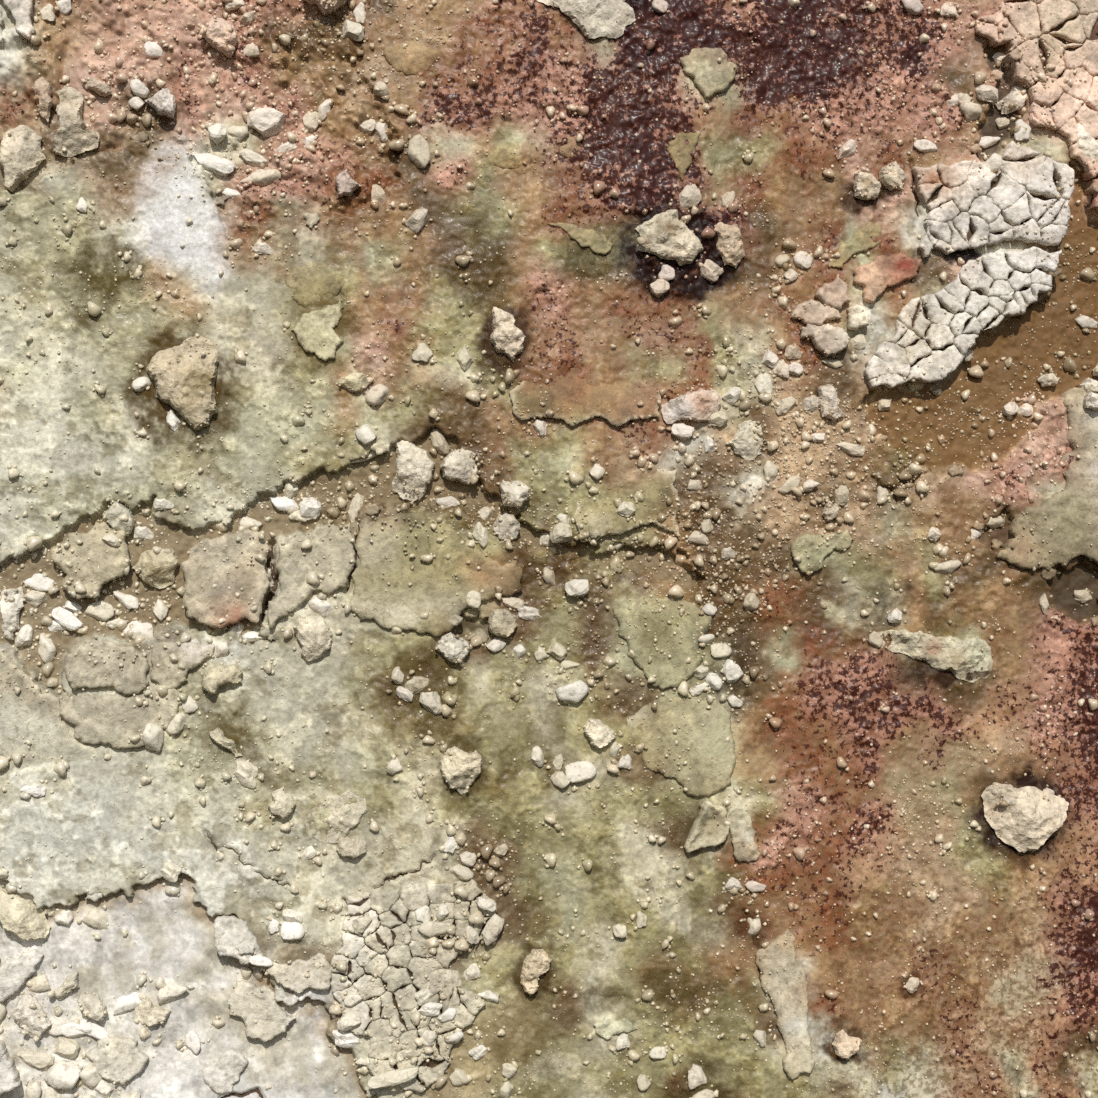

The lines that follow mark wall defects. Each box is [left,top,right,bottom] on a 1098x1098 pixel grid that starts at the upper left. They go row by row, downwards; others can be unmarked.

rust [518,260,600,382]
rust [602,281,711,458]
rust [405,0,996,256]
rust [774,213,849,386]
crack [863,0,1098,389]
crack [261,545,279,621]
crack [347,522,360,591]
spalling [0,429,761,863]
rust [762,583,803,623]
rust [728,611,1098,1098]
spalling [0,864,377,1098]
crack [330,857,497,1094]